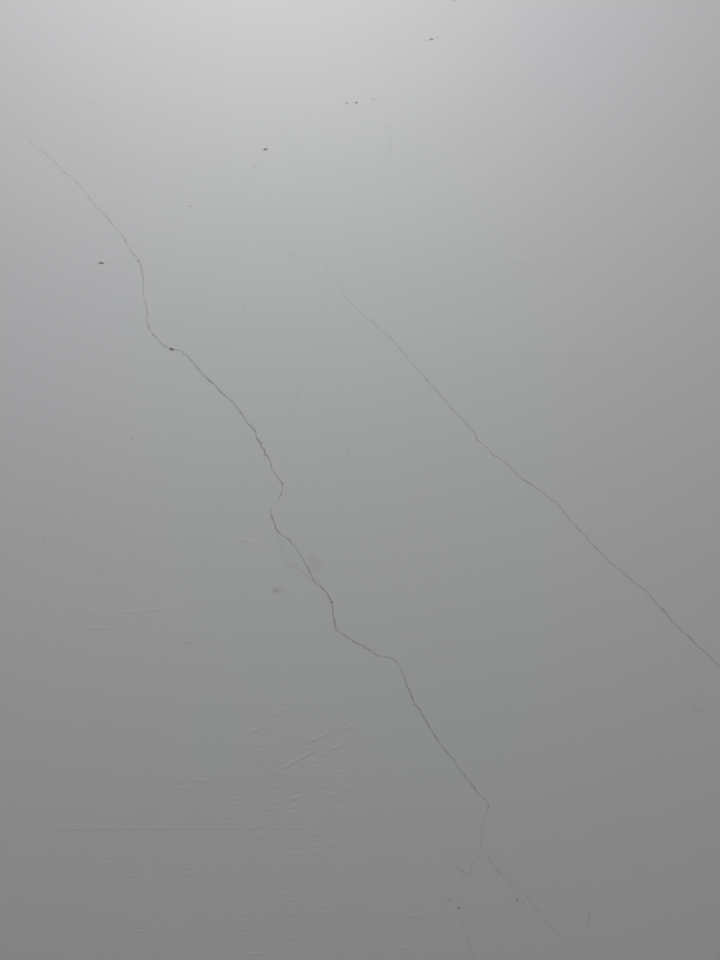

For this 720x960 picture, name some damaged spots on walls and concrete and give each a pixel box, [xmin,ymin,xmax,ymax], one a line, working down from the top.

crack [10,122,562,960]
crack [240,198,720,668]